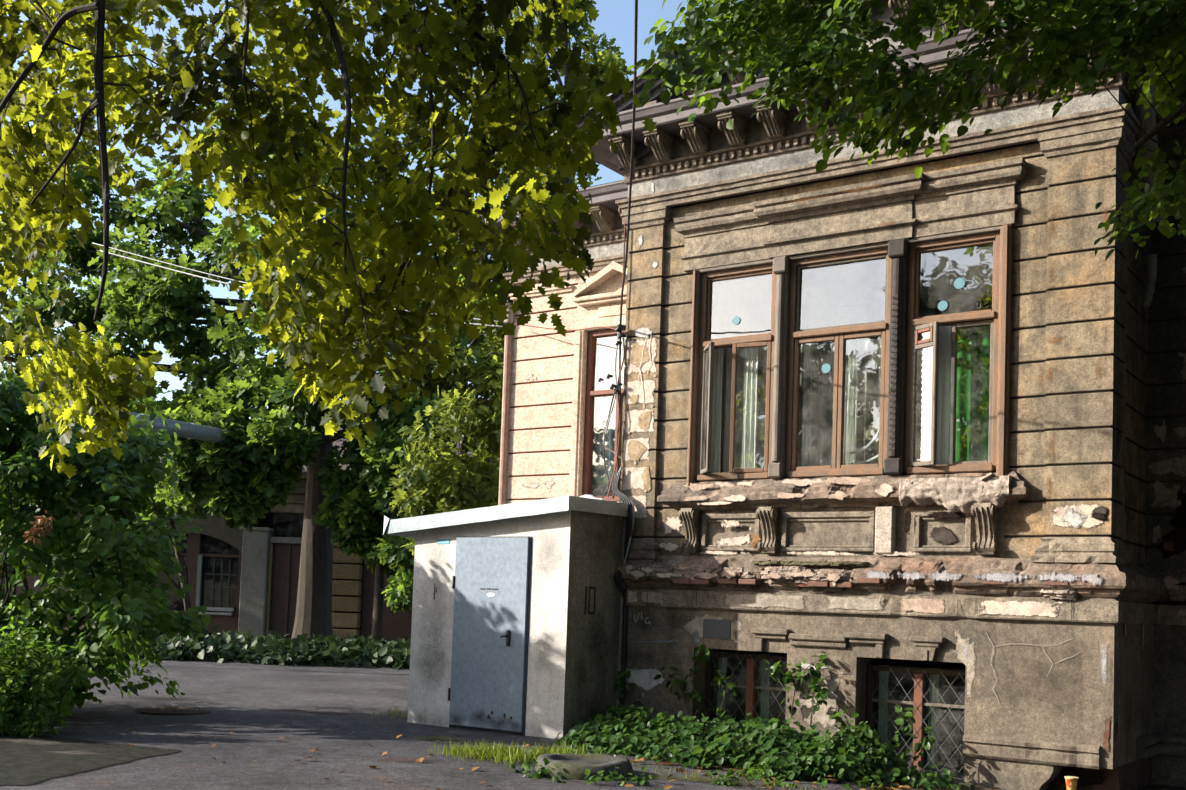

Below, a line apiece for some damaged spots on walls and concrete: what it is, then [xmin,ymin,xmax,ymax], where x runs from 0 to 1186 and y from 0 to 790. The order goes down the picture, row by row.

peeling [620,327,657,519]
peeling [681,481,752,505]
peeling [774,476,894,500]
peeling [1050,503,1108,529]
peeling [1146,419,1186,558]
peeling [624,511,1102,644]
peeling [625,667,671,697]
peeling [952,628,976,699]
crack [986,600,1082,704]